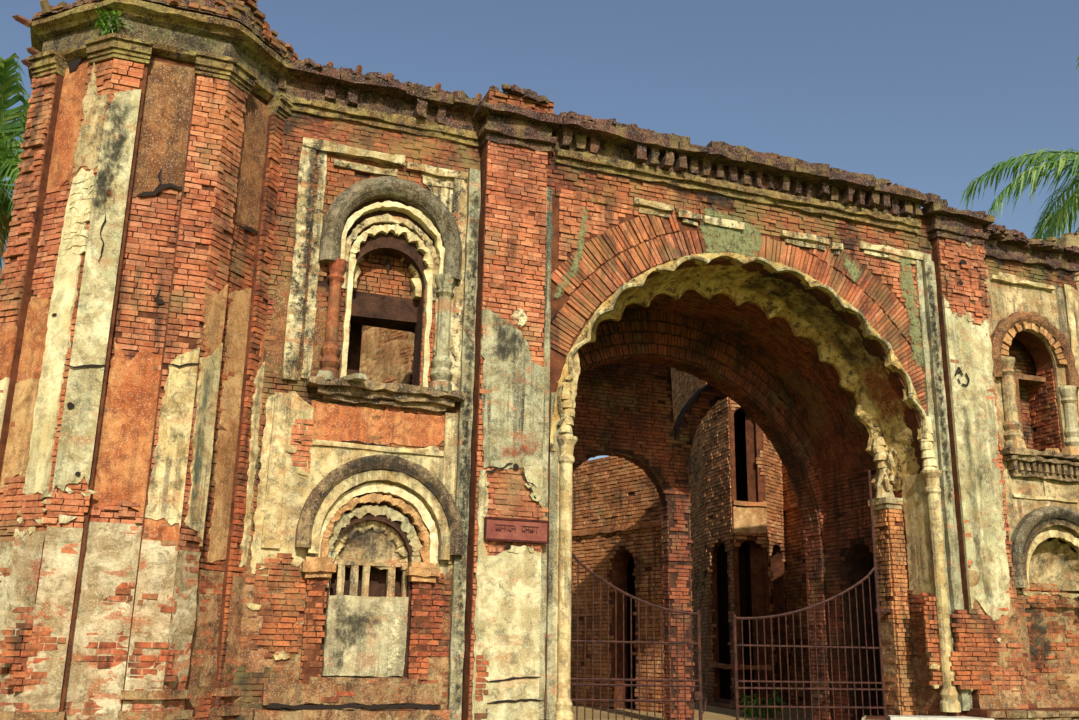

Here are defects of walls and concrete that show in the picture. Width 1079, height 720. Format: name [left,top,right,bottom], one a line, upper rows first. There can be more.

crack [138,168,182,196]
damp [700,209,763,257]
damp [844,258,860,282]
flaking render [943,242,991,325]
damp [494,308,529,359]
damp [333,196,479,708]
flaking render [482,468,548,520]
flaking render [485,541,546,555]
flaking render [0,473,452,720]
spalling [474,655,489,720]
flaking render [881,622,900,715]
flaking render [905,570,1079,716]